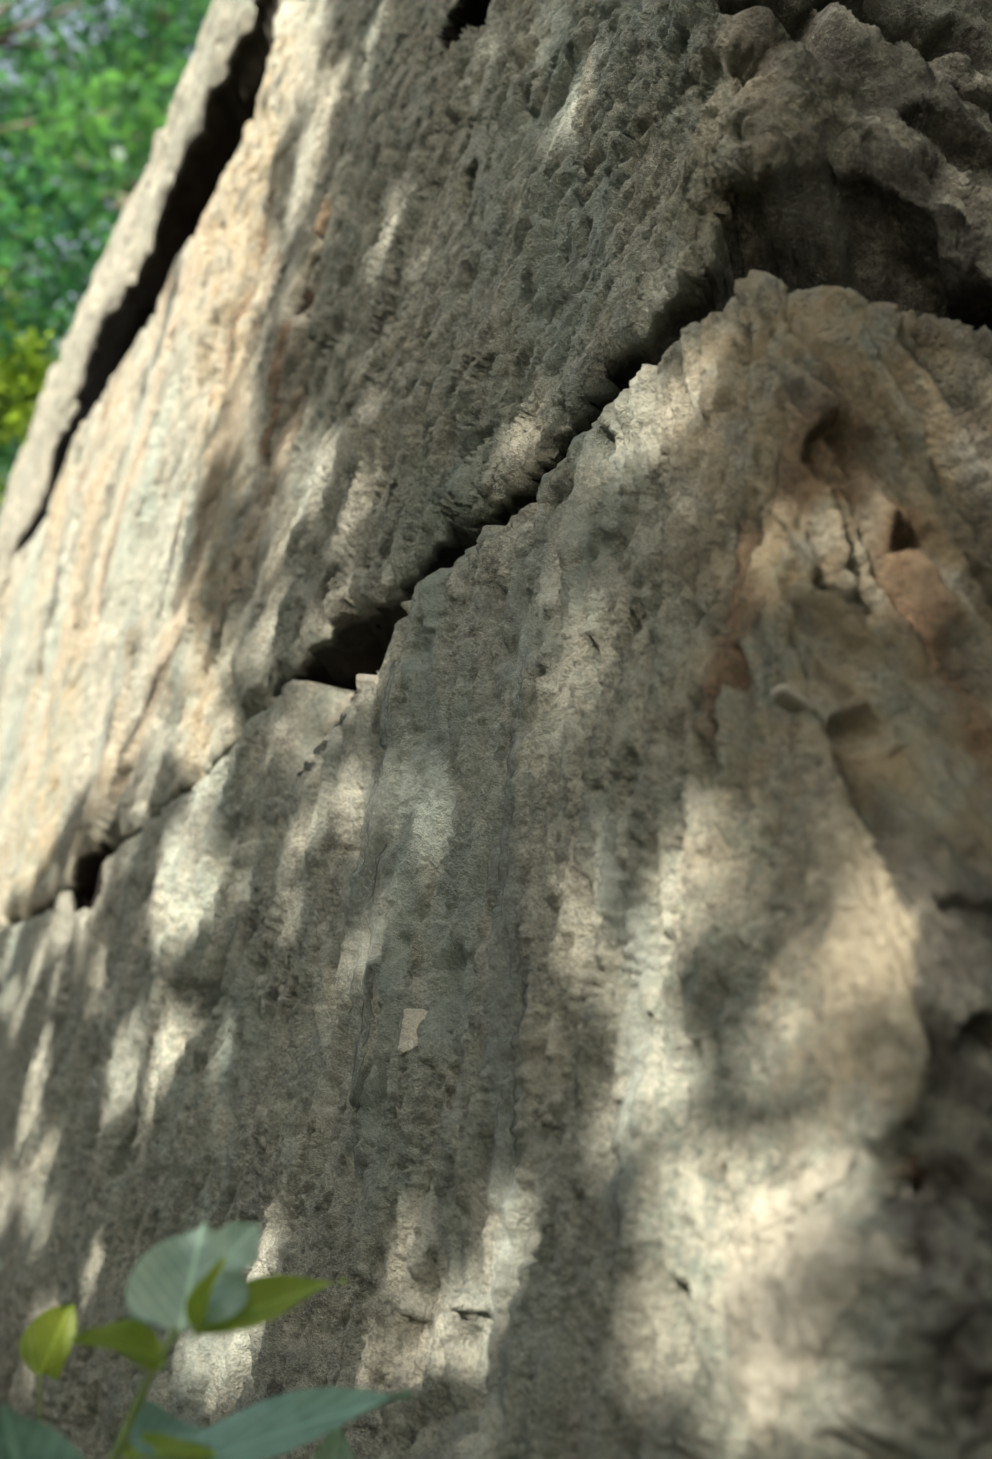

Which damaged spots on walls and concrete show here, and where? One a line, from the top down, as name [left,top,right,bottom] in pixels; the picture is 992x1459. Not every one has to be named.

crack [259,198,330,459]